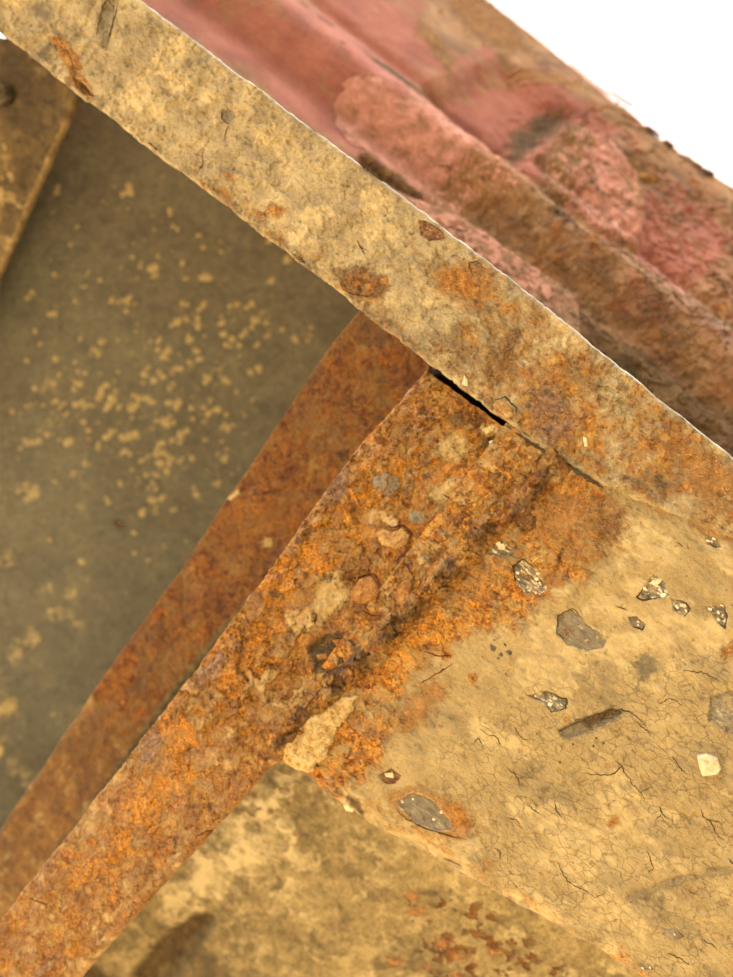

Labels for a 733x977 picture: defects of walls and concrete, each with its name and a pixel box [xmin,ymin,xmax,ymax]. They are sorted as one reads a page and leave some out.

corrosion [50,36,94,99]
corrosion [340,265,391,297]
corrosion [436,263,494,305]
corrosion [485,329,519,384]
corrosion [438,458,476,498]
crack [514,432,604,488]
corrosion [519,490,621,560]
corrosion [0,310,430,922]